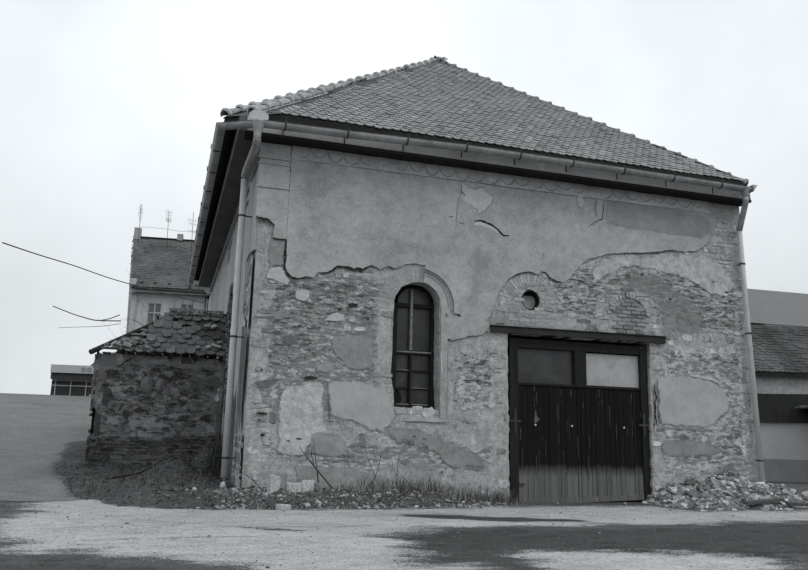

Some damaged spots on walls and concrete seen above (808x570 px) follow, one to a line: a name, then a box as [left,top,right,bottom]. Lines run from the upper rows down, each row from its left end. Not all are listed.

crack [450,184,509,242]
flaking render [461,183,499,233]
spalling [231,221,508,496]
spalling [559,218,757,492]
spalling [87,389,217,466]